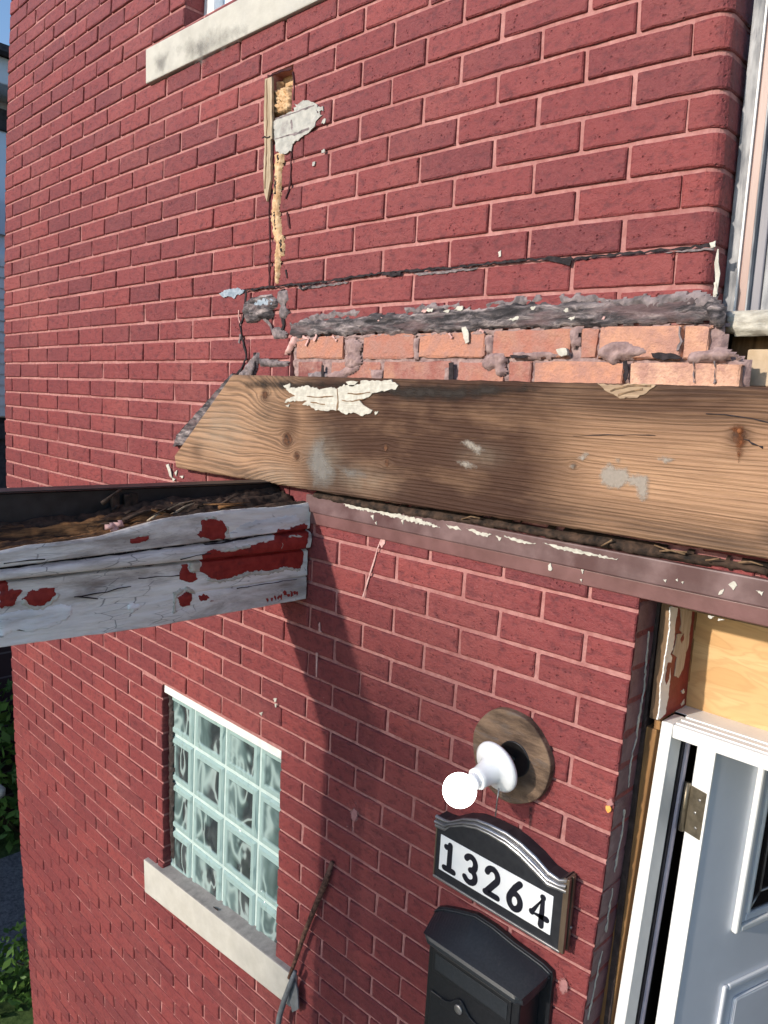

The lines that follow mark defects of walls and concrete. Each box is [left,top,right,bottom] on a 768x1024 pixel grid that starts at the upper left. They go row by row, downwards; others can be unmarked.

spalling [273,100,326,155]
crack [237,67,716,375]
spalling [284,249,753,416]
peeling [0,580,72,638]
peeling [130,534,150,544]
peeling [172,515,309,614]
peeling [345,504,617,560]
peeling [656,606,724,720]